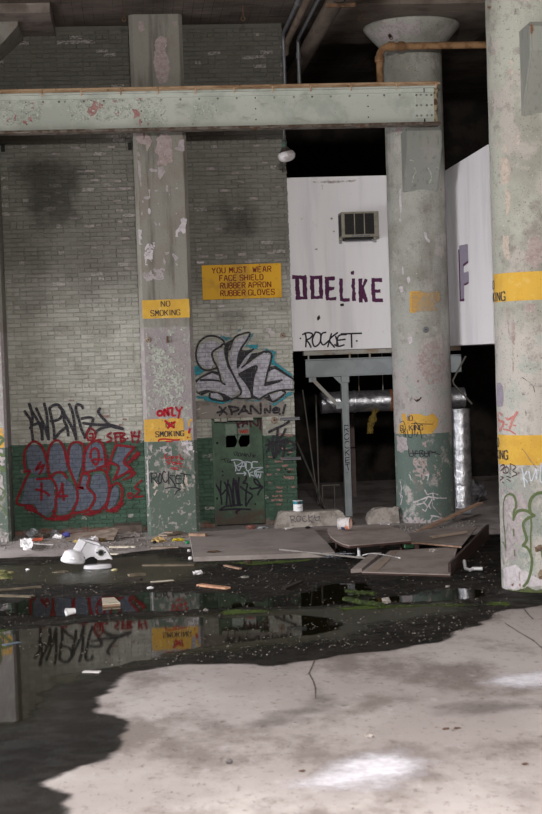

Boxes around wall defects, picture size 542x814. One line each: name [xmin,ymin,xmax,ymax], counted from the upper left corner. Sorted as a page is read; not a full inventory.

peeling [67,98,185,226]
peeling [113,200,178,281]
peeling [175,213,187,237]
damp [0,534,542,814]
crack [306,659,317,698]